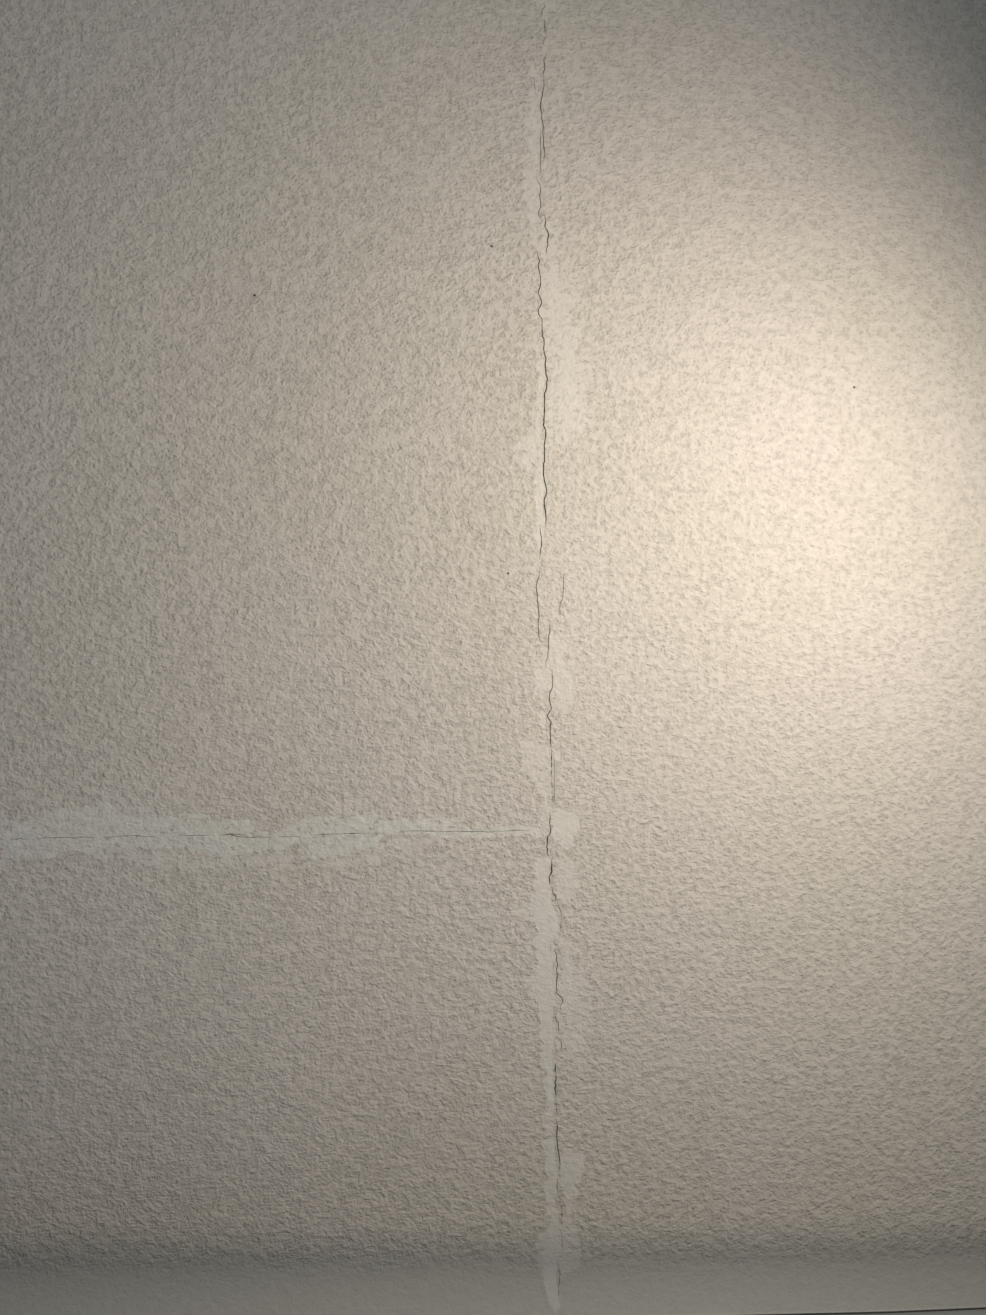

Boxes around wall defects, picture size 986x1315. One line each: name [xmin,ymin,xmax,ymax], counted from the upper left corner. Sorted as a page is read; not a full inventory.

crack [441,8,564,1296]